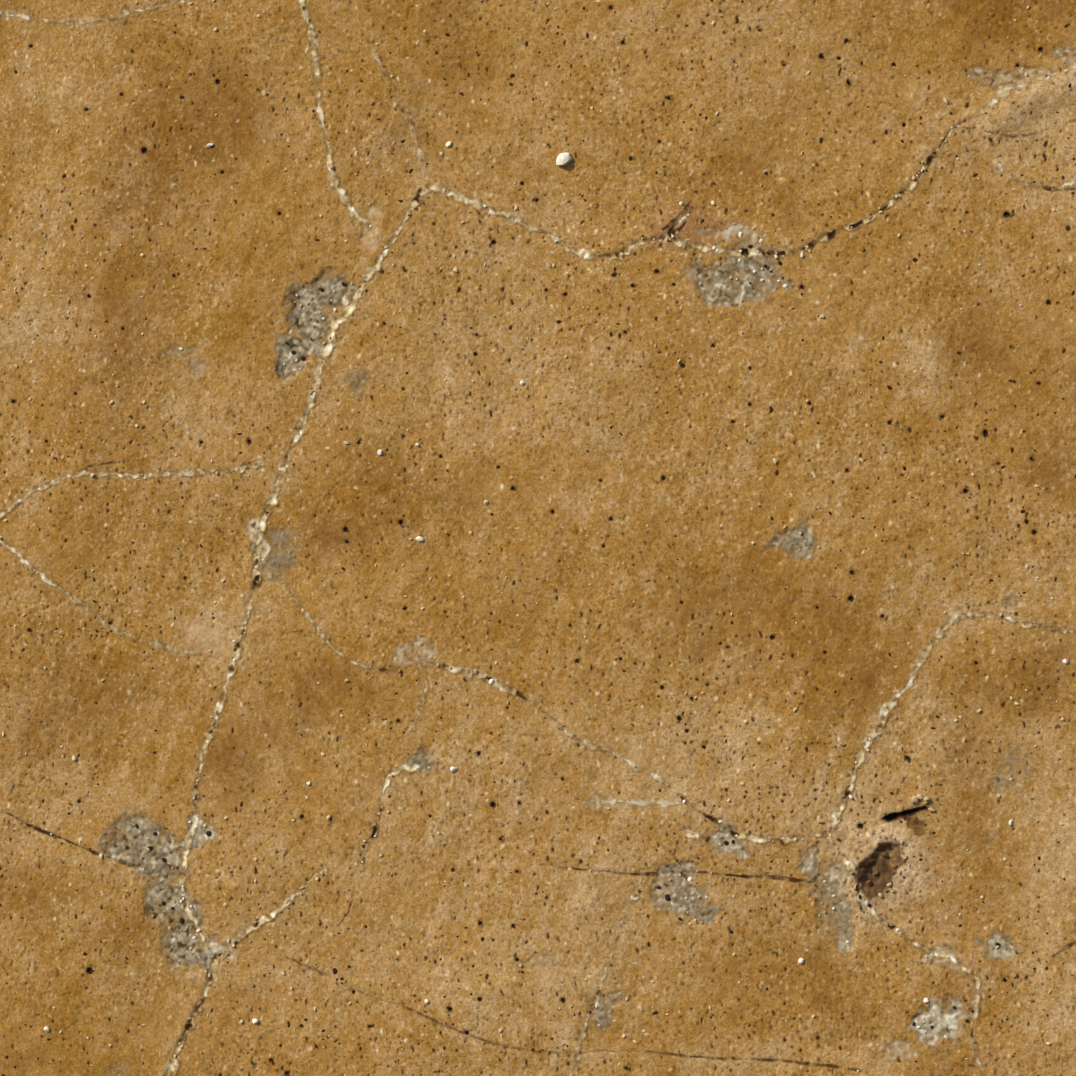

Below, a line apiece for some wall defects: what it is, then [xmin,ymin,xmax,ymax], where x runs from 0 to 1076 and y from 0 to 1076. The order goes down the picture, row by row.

crack [0,0,184,24]
crack [299,0,371,230]
crack [975,61,1076,137]
crack [994,162,1076,191]
spalling [694,223,804,307]
spalling [275,276,357,380]
crack [0,126,959,1076]
spalling [103,816,233,972]
spalling [652,863,719,924]
crack [1053,941,1076,957]
peeling [888,1040,916,1059]
spalling [911,998,969,1044]